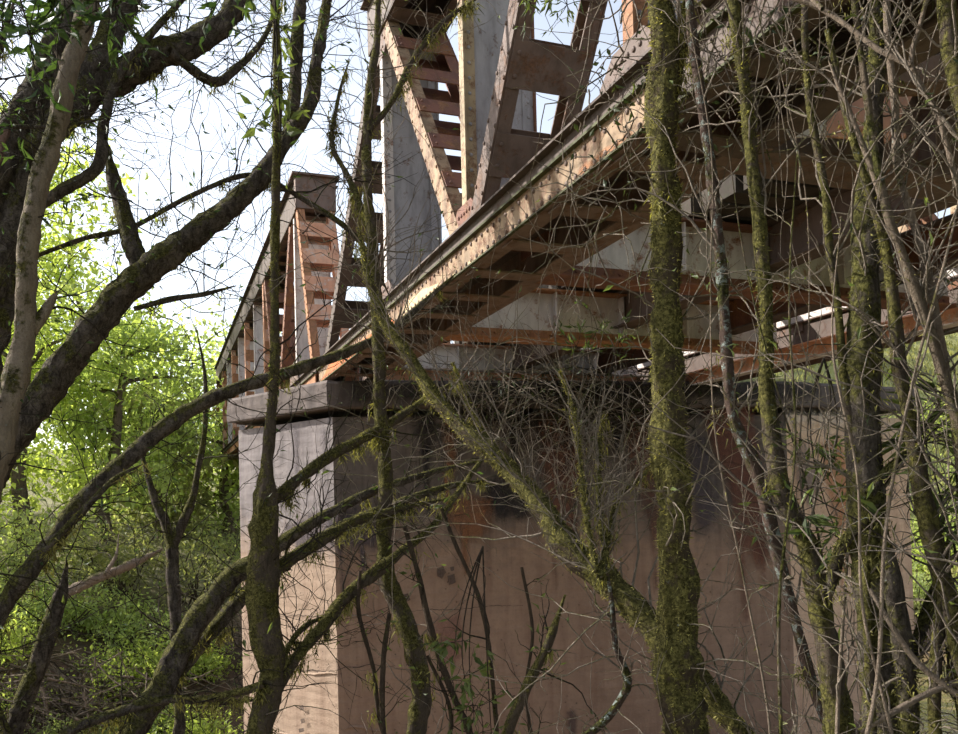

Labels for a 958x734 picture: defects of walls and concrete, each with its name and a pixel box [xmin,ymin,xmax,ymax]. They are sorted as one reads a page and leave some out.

rust [709,407,768,566]